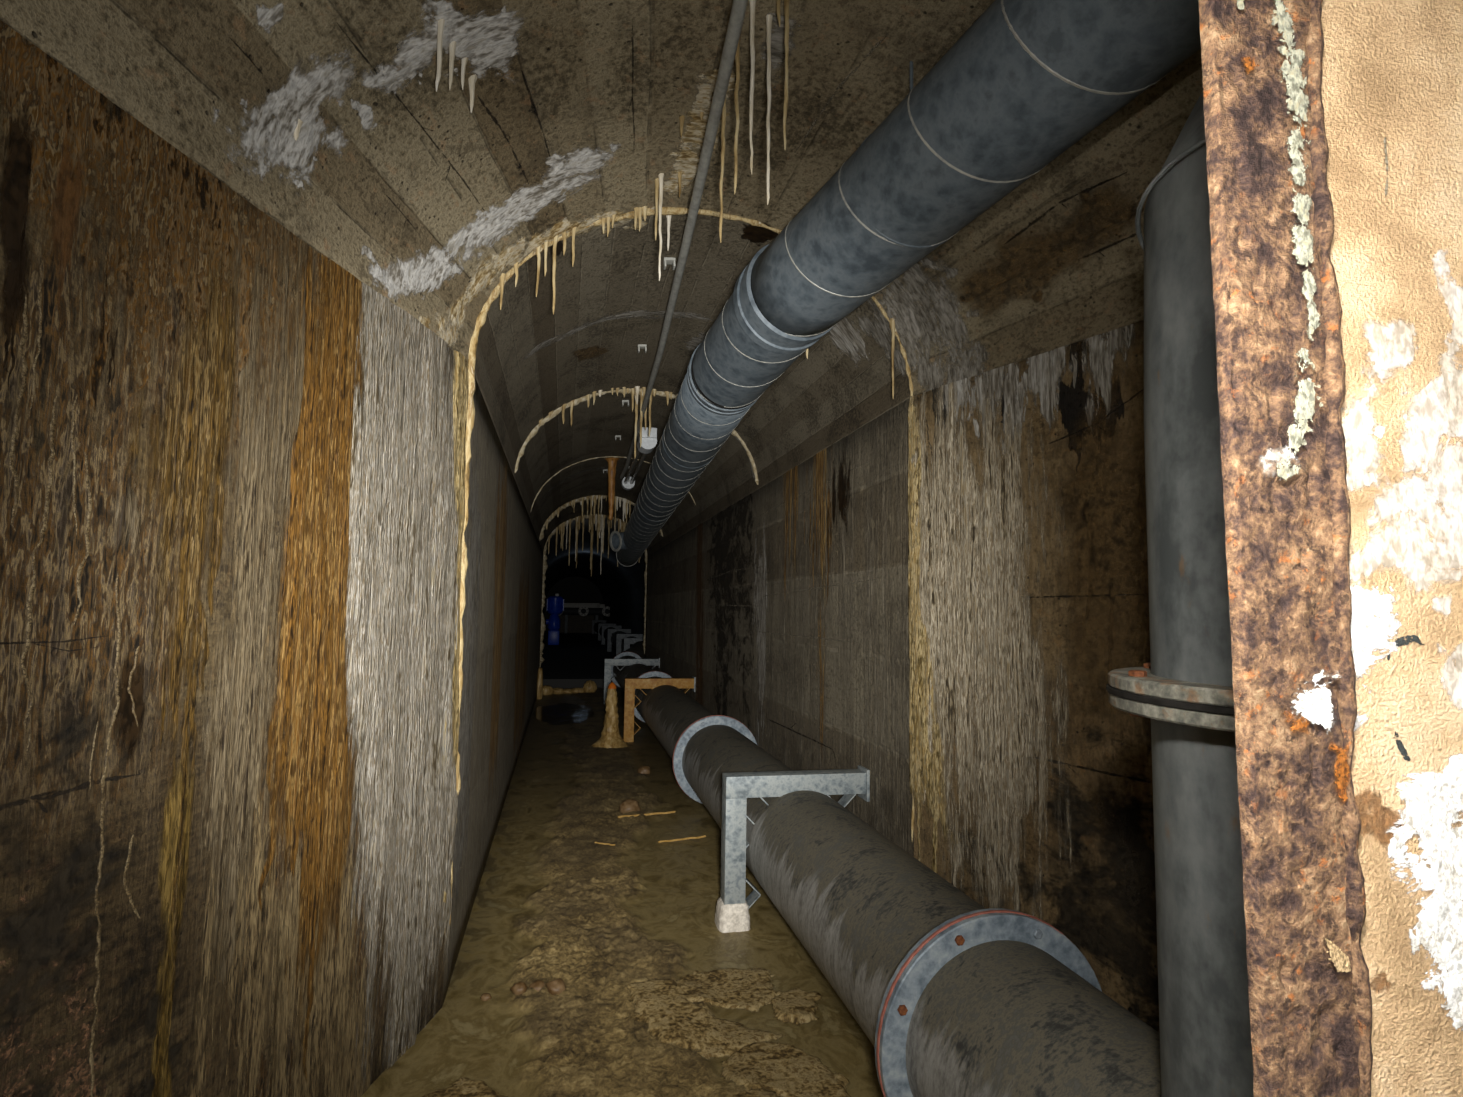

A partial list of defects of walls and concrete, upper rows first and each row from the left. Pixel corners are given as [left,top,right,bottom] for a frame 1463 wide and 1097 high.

efflorescence [215,0,523,187]
corrosion [1242,57,1259,73]
leakage [0,117,43,531]
leakage [741,223,777,246]
leakage [731,430,758,485]
crack [0,636,104,652]
leakage [20,395,92,752]
crack [0,774,140,813]
leakage [89,573,145,1097]
leakage [190,69,736,1097]
leakage [829,258,1133,920]
corrosion [1285,713,1308,731]